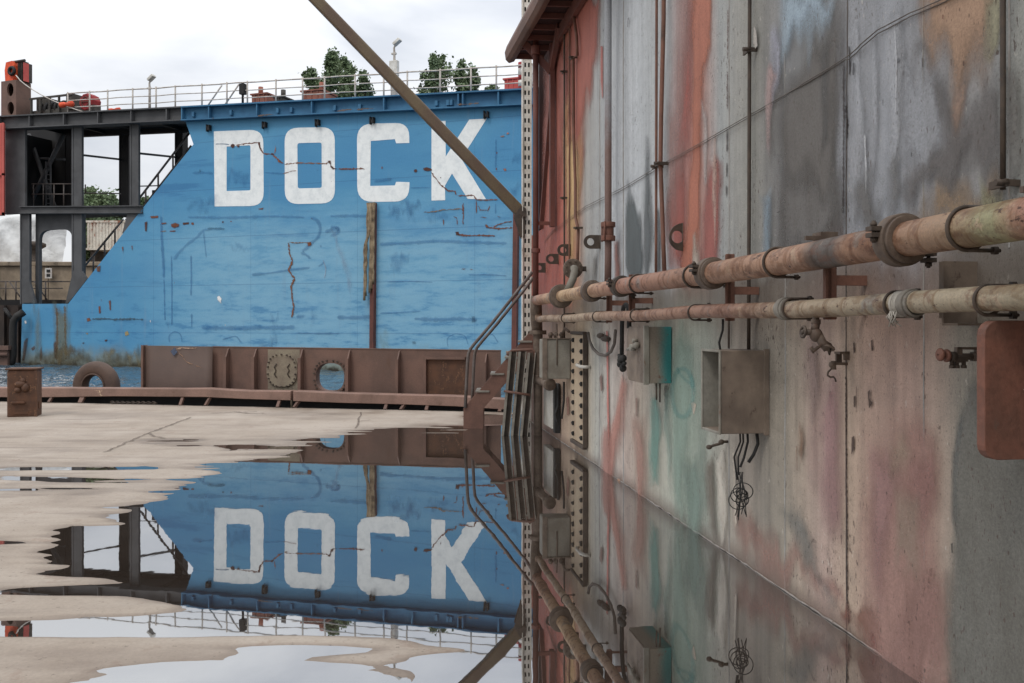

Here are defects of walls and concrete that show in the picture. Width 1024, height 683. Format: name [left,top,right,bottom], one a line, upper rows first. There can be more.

rust [428,205,512,237]
rust [288,242,311,317]
rust [83,301,143,344]